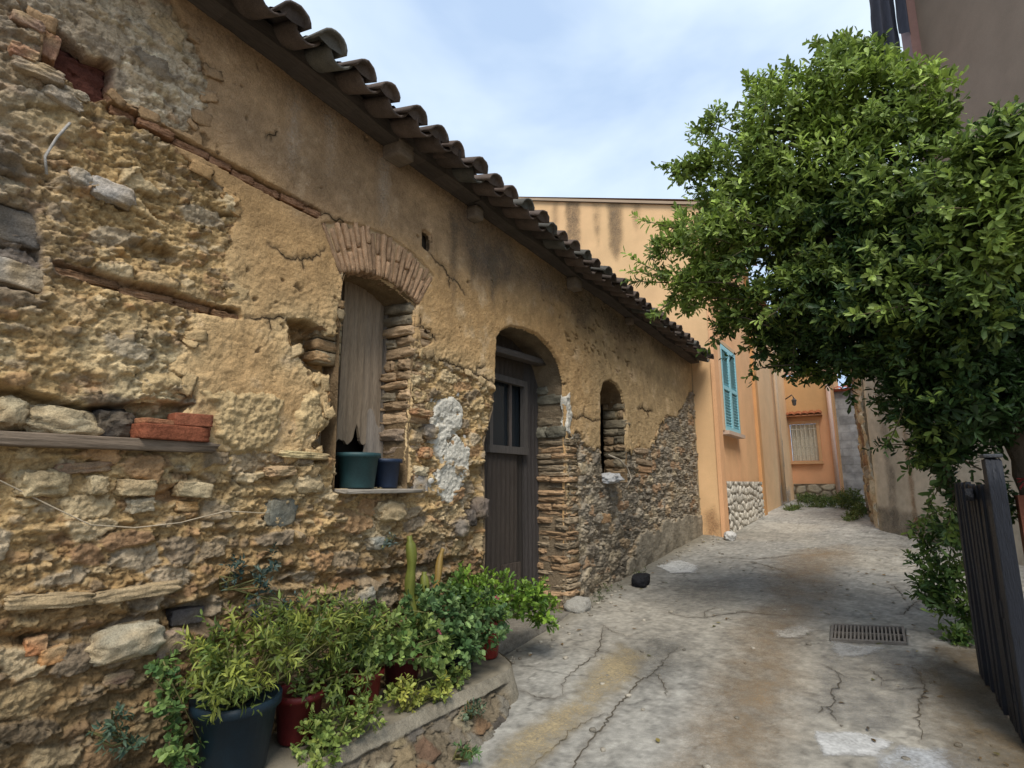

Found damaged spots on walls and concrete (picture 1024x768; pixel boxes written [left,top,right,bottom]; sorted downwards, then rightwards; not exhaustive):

flaking render [0,0,321,420]
crack [272,247,325,267]
water stain [567,203,579,240]
water stain [609,205,621,253]
flaking render [560,391,701,603]
crack [526,625,629,698]
crack [529,654,669,768]
crack [819,666,844,719]
crack [868,668,927,740]